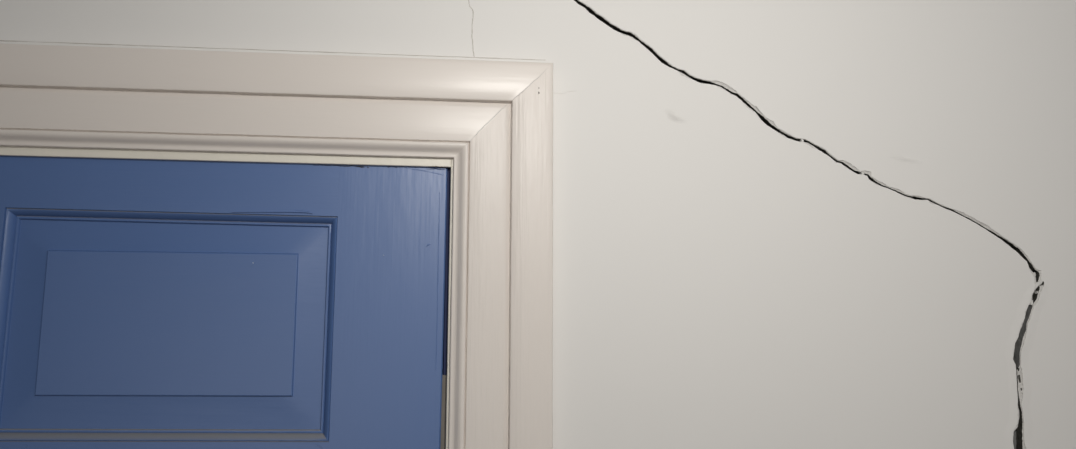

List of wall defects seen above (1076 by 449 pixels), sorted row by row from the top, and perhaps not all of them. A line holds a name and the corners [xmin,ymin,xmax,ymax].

crack [574,0,1049,449]